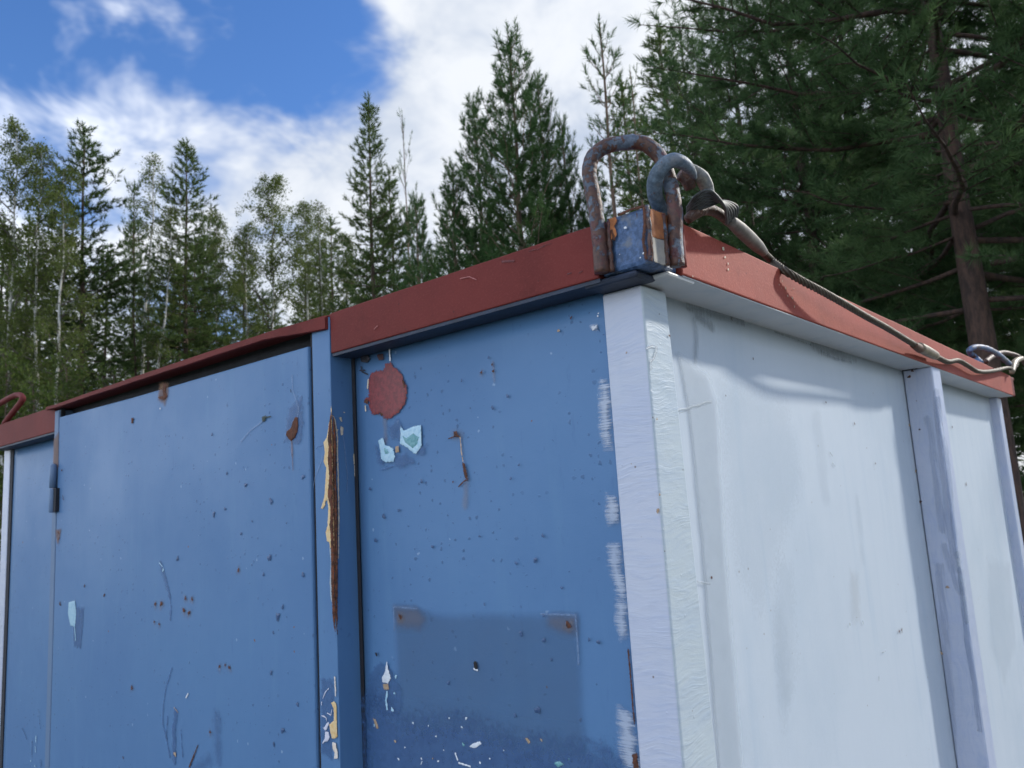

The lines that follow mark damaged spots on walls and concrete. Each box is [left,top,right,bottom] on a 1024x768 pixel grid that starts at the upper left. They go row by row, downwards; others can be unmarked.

corrosion [609,205,668,265]
peeling [377,422,424,469]
peeling [68,601,83,648]
peeling [321,676,338,759]
peeling [361,662,624,768]